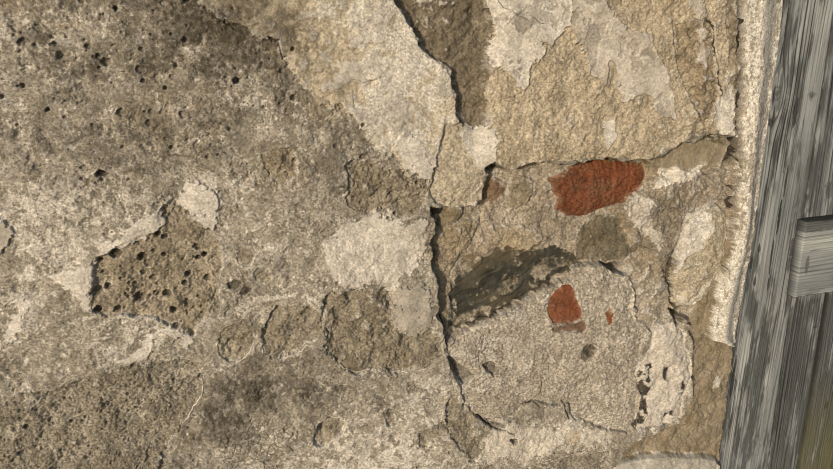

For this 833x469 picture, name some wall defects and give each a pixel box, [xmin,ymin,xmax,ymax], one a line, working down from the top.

spalling [0,179,225,469]
peeling [198,0,741,467]